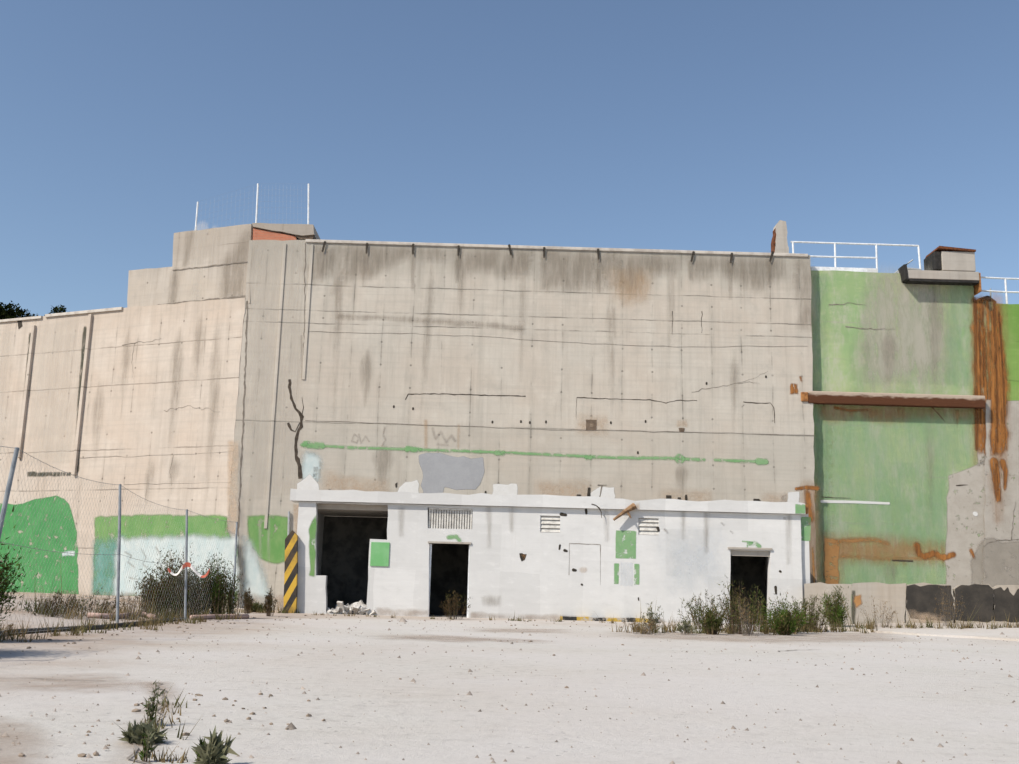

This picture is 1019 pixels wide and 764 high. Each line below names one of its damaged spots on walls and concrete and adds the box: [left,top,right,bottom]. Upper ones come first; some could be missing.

crack [287,379,494,479]
rust [971,273,1008,502]
rust [795,486,819,522]
peeling [945,398,1019,595]
rust [812,538,956,584]